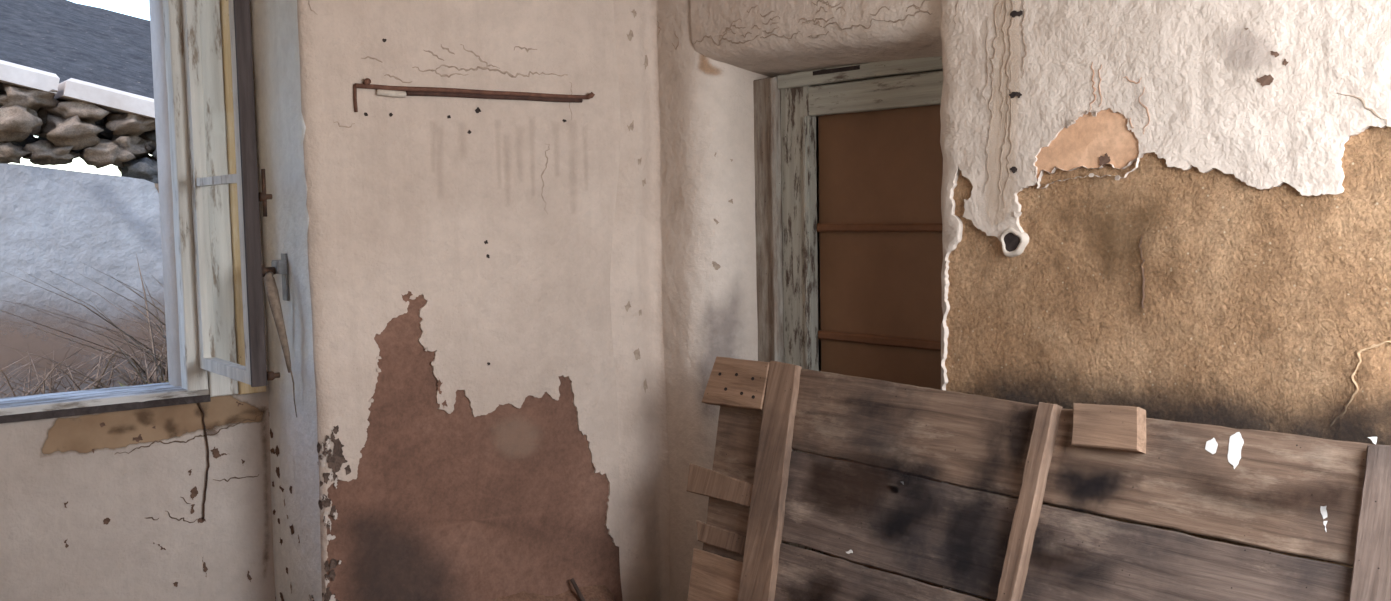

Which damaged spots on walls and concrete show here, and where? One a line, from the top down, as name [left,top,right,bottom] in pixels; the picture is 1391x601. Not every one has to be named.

crack [362,44,572,214]
crack [657,0,1027,212]
peeling [945,108,1391,430]
crack [146,497,201,523]
crack [115,414,261,454]
spalling [188,469,206,523]
spalling [270,428,300,545]
peeling [308,291,623,601]
peeling [1042,503,1353,568]